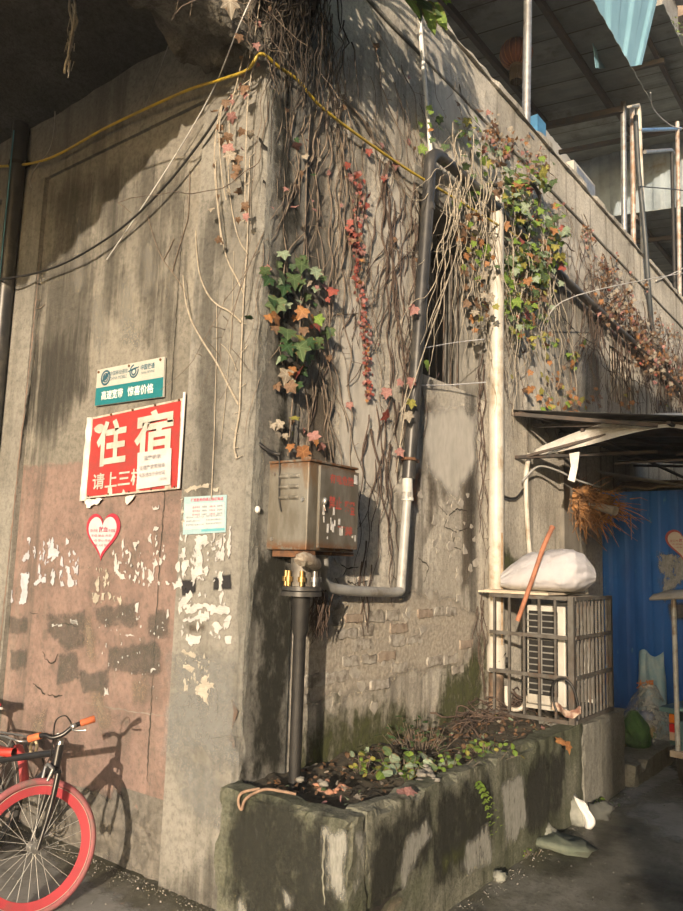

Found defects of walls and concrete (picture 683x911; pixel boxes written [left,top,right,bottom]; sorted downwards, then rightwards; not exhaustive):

crack [170,200,185,401]
peeling [340,283,402,496]
peeling [376,182,407,310]
crack [85,491,165,778]
spalling [303,406,479,715]